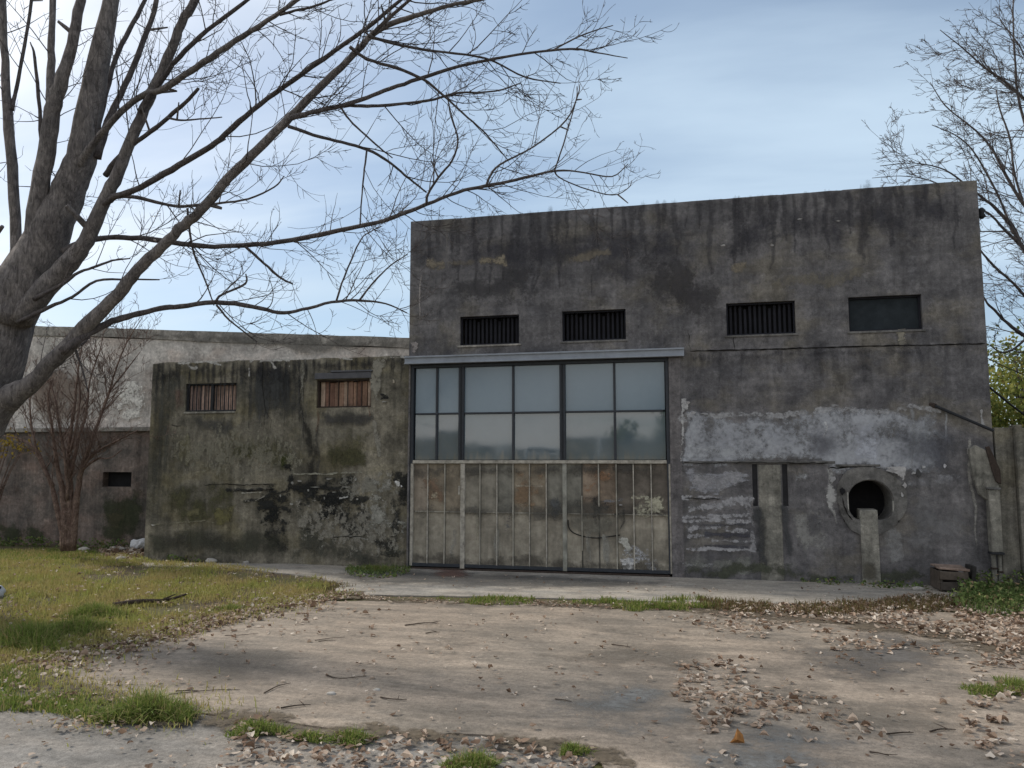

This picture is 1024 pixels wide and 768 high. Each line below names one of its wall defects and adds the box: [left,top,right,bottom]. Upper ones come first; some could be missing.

water stain [457,235,718,313]
flaking render [280,471,406,556]
water stain [150,333,634,586]
flaking render [680,398,708,462]
flaking render [886,466,926,497]